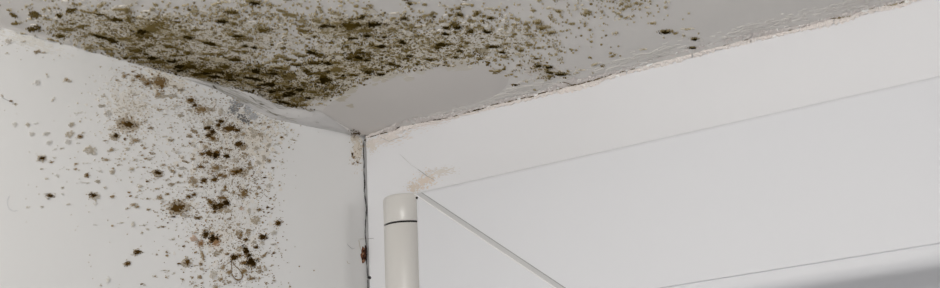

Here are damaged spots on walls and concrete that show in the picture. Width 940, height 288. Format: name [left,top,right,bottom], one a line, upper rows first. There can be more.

leakage [0,0,703,288]
flaking render [365,0,921,145]